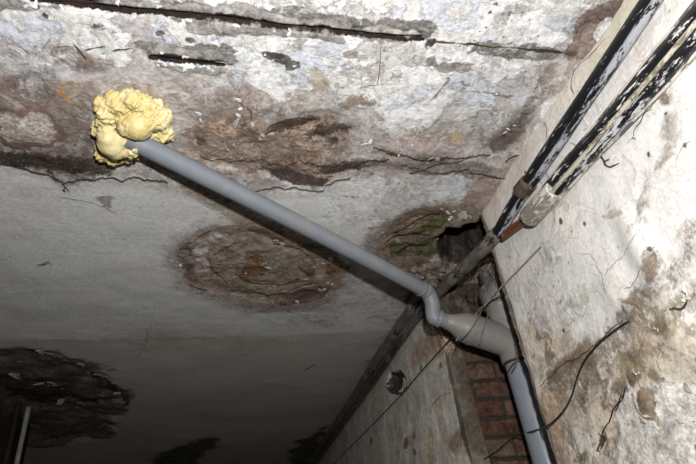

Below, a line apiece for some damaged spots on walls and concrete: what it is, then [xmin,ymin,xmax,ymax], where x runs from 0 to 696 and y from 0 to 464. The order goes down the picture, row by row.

crack [0,163,168,192]
crack [255,139,502,192]
spalling [167,220,353,313]
spalling [364,201,486,288]
leakage [541,222,696,464]
spalling [0,349,135,449]